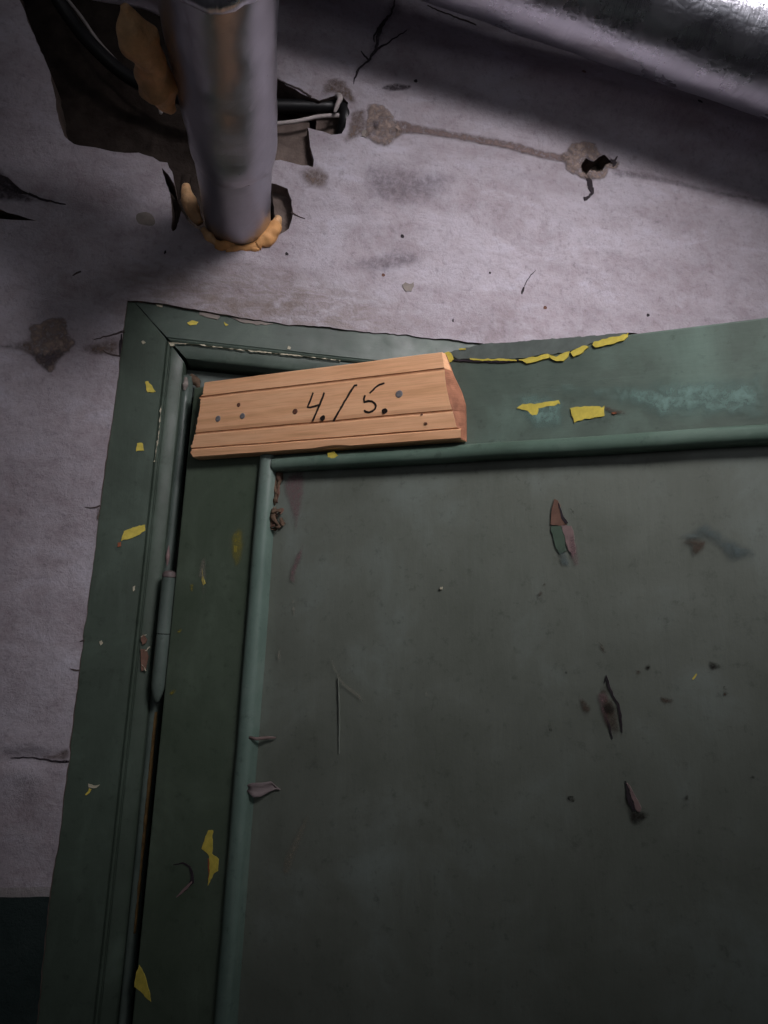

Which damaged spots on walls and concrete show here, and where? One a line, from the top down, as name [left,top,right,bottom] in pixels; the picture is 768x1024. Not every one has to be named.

crack [353,0,407,84]
spalling [23,0,206,231]
spalling [275,114,339,167]
spalling [0,173,66,205]
spalling [271,192,292,235]
peeling [445,333,628,364]
peeling [517,384,757,424]
spalling [550,499,577,564]
spalling [600,675,623,739]
peeling [202,830,219,885]